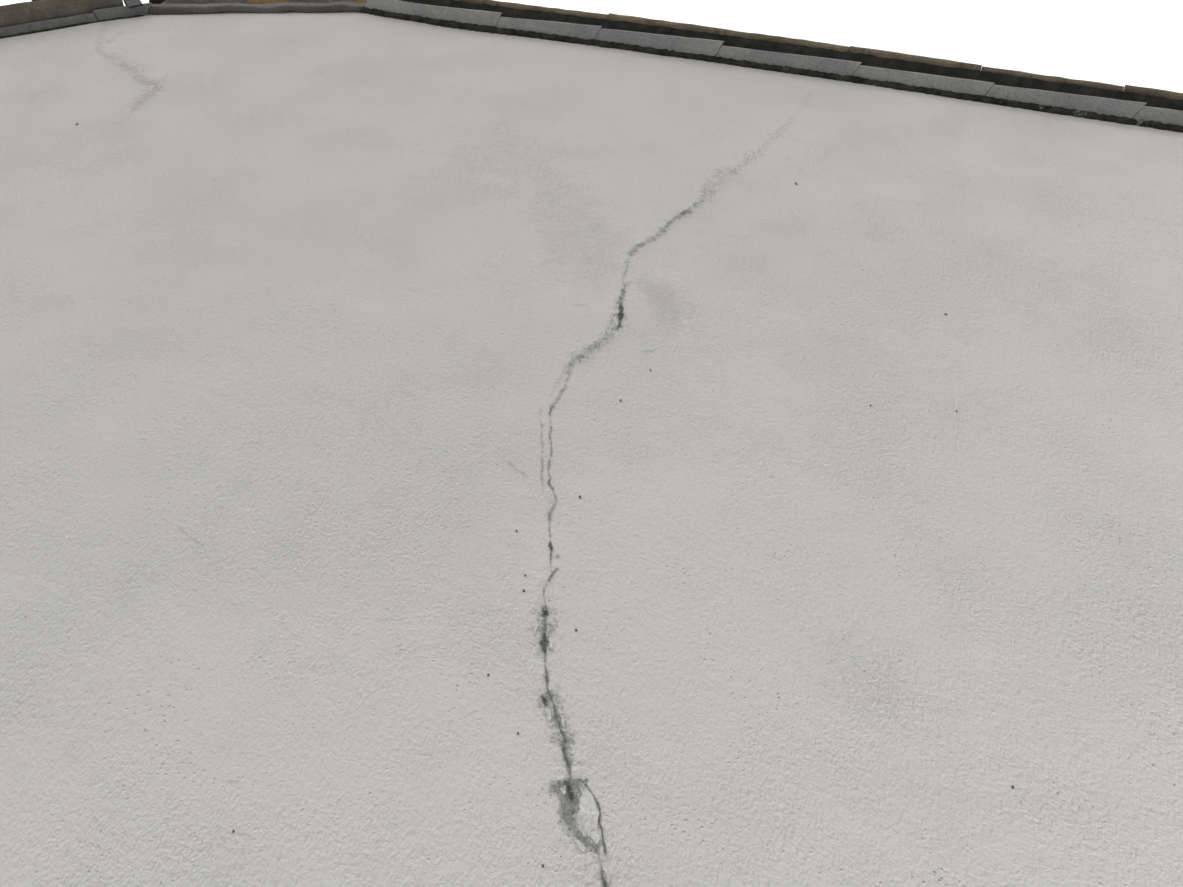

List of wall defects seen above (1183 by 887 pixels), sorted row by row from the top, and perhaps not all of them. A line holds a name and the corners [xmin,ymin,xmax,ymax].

crack [587,297,624,358]
crack [532,406,612,887]